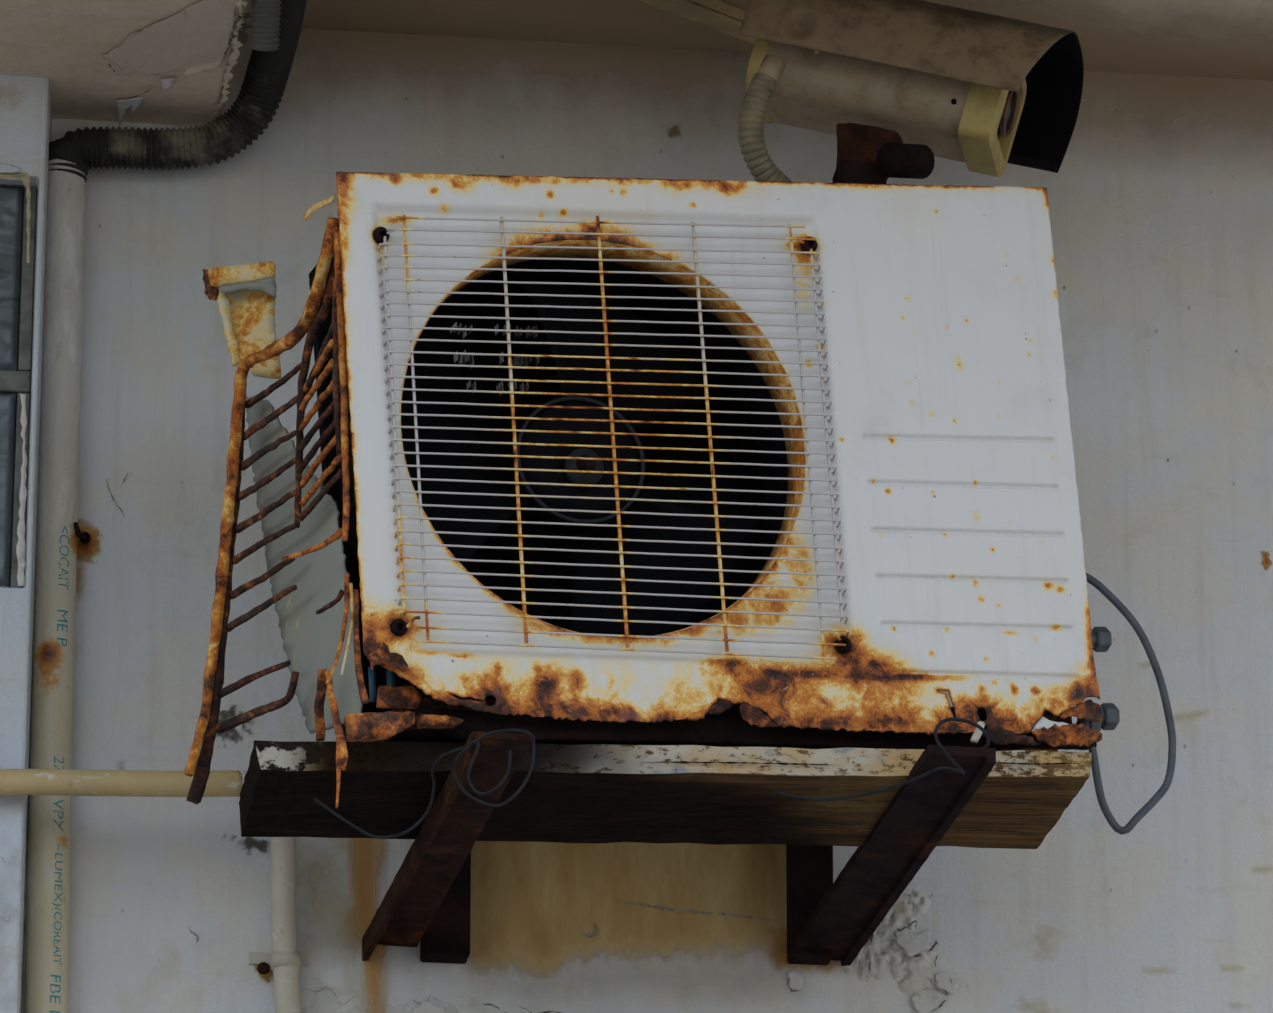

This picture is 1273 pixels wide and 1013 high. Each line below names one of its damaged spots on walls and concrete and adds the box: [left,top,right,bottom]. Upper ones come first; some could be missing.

peeling [103,0,251,126]
corrosion [1261,552,1272,570]
crack [484,1003,561,1013]
leakage [470,841,787,975]
flaking render [838,888,969,1013]